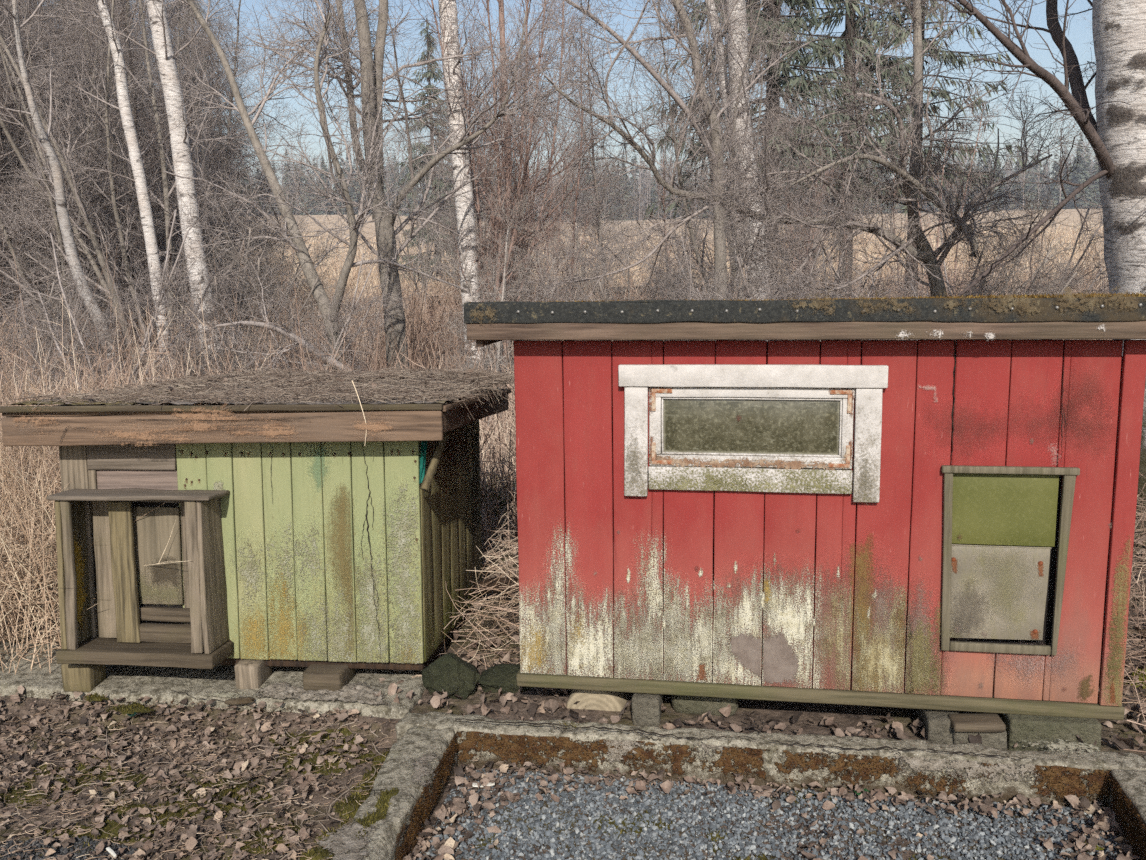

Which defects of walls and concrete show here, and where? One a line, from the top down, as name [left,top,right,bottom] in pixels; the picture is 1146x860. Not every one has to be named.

leakage [331,489,354,654]
crack [361,442,381,659]
peeling [519,525,939,695]